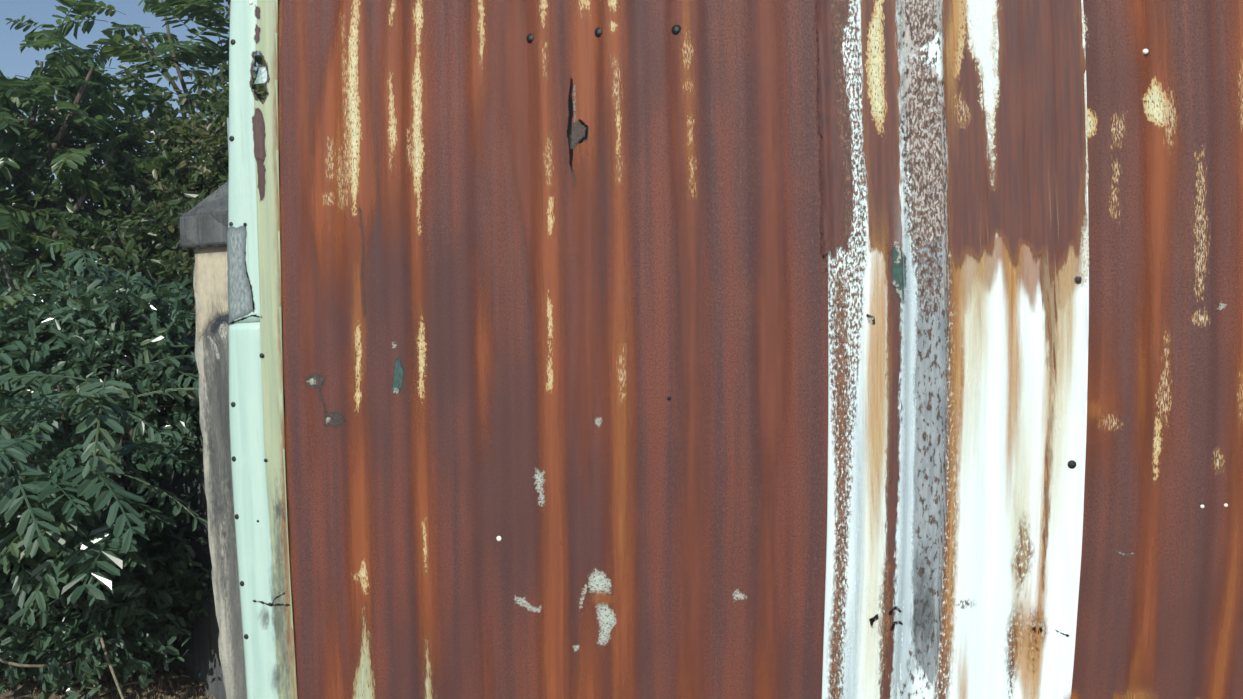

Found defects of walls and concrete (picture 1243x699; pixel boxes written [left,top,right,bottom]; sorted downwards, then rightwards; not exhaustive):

water stain [182,212,228,227]
water stain [184,314,247,699]
corrosion [308,0,436,648]
peeling [514,595,541,613]
corrosion [506,0,597,699]
crack [567,78,588,185]
peeling [579,567,618,646]
corrosion [571,0,633,699]
corrosion [671,0,700,671]
corrosion [813,0,1087,699]
corrosion [1087,363,1124,434]
corrosion [1139,22,1178,429]